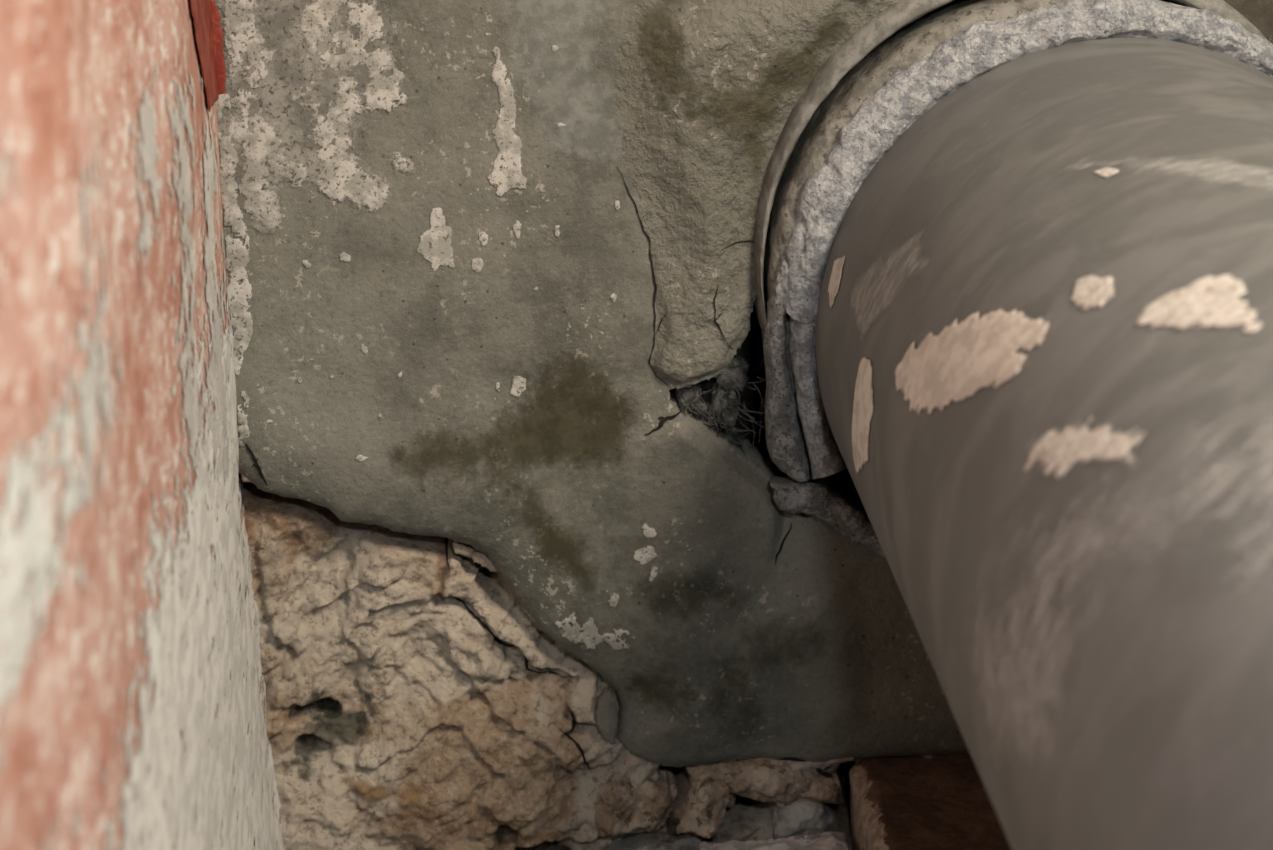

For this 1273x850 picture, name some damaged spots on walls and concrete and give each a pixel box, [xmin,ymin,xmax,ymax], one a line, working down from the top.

leakage [641,9,846,178]
peeling [0,118,124,726]
flaking render [91,0,863,850]
leakage [395,361,631,476]
crack [617,167,682,435]